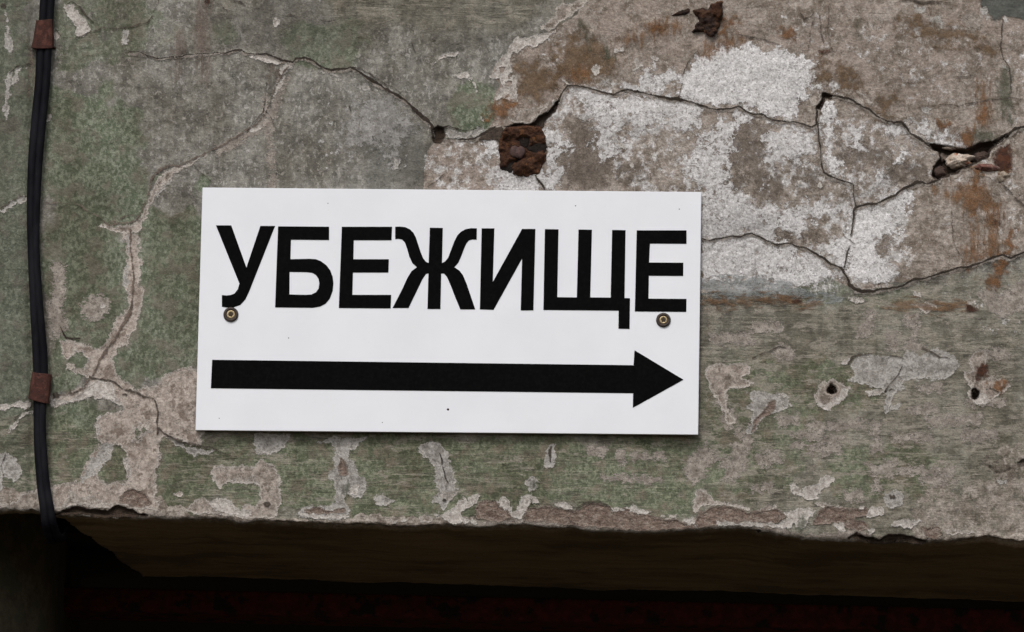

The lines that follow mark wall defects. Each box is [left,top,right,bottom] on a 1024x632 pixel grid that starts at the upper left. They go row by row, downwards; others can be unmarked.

peeling [914,4,945,31]
peeling [490,0,588,124]
spalling [500,137,547,173]
crack [45,0,1024,295]
spalling [927,138,1004,179]
peeling [967,279,1024,318]
peeling [390,291,1024,544]